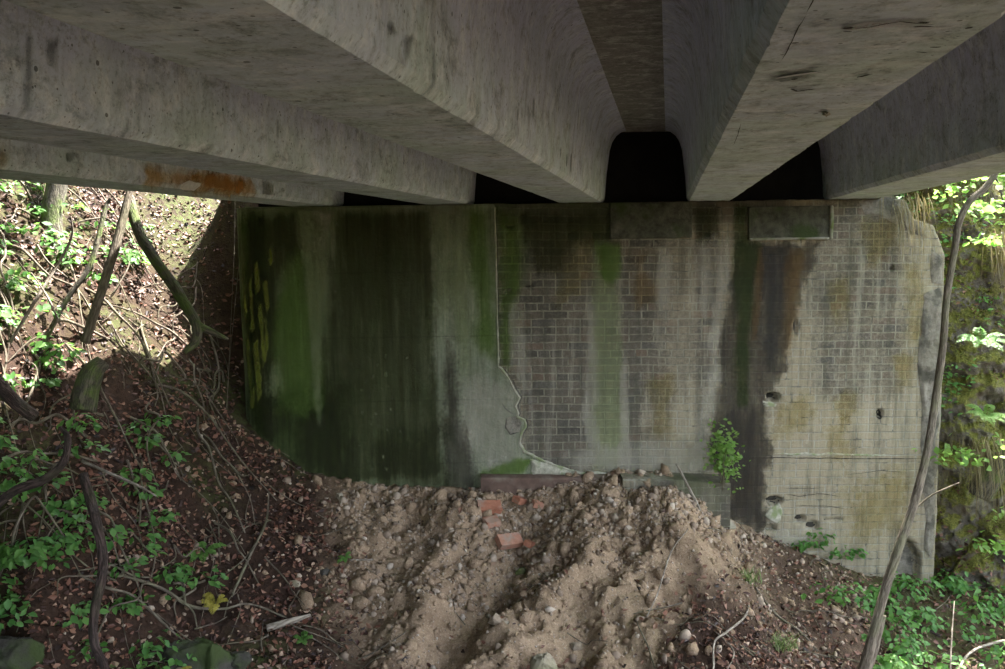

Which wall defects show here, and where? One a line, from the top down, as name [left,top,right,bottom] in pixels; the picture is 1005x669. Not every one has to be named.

corrosion [144,165,255,198]
damp [294,209,331,411]
damp [429,209,532,490]
damp [564,235,819,533]